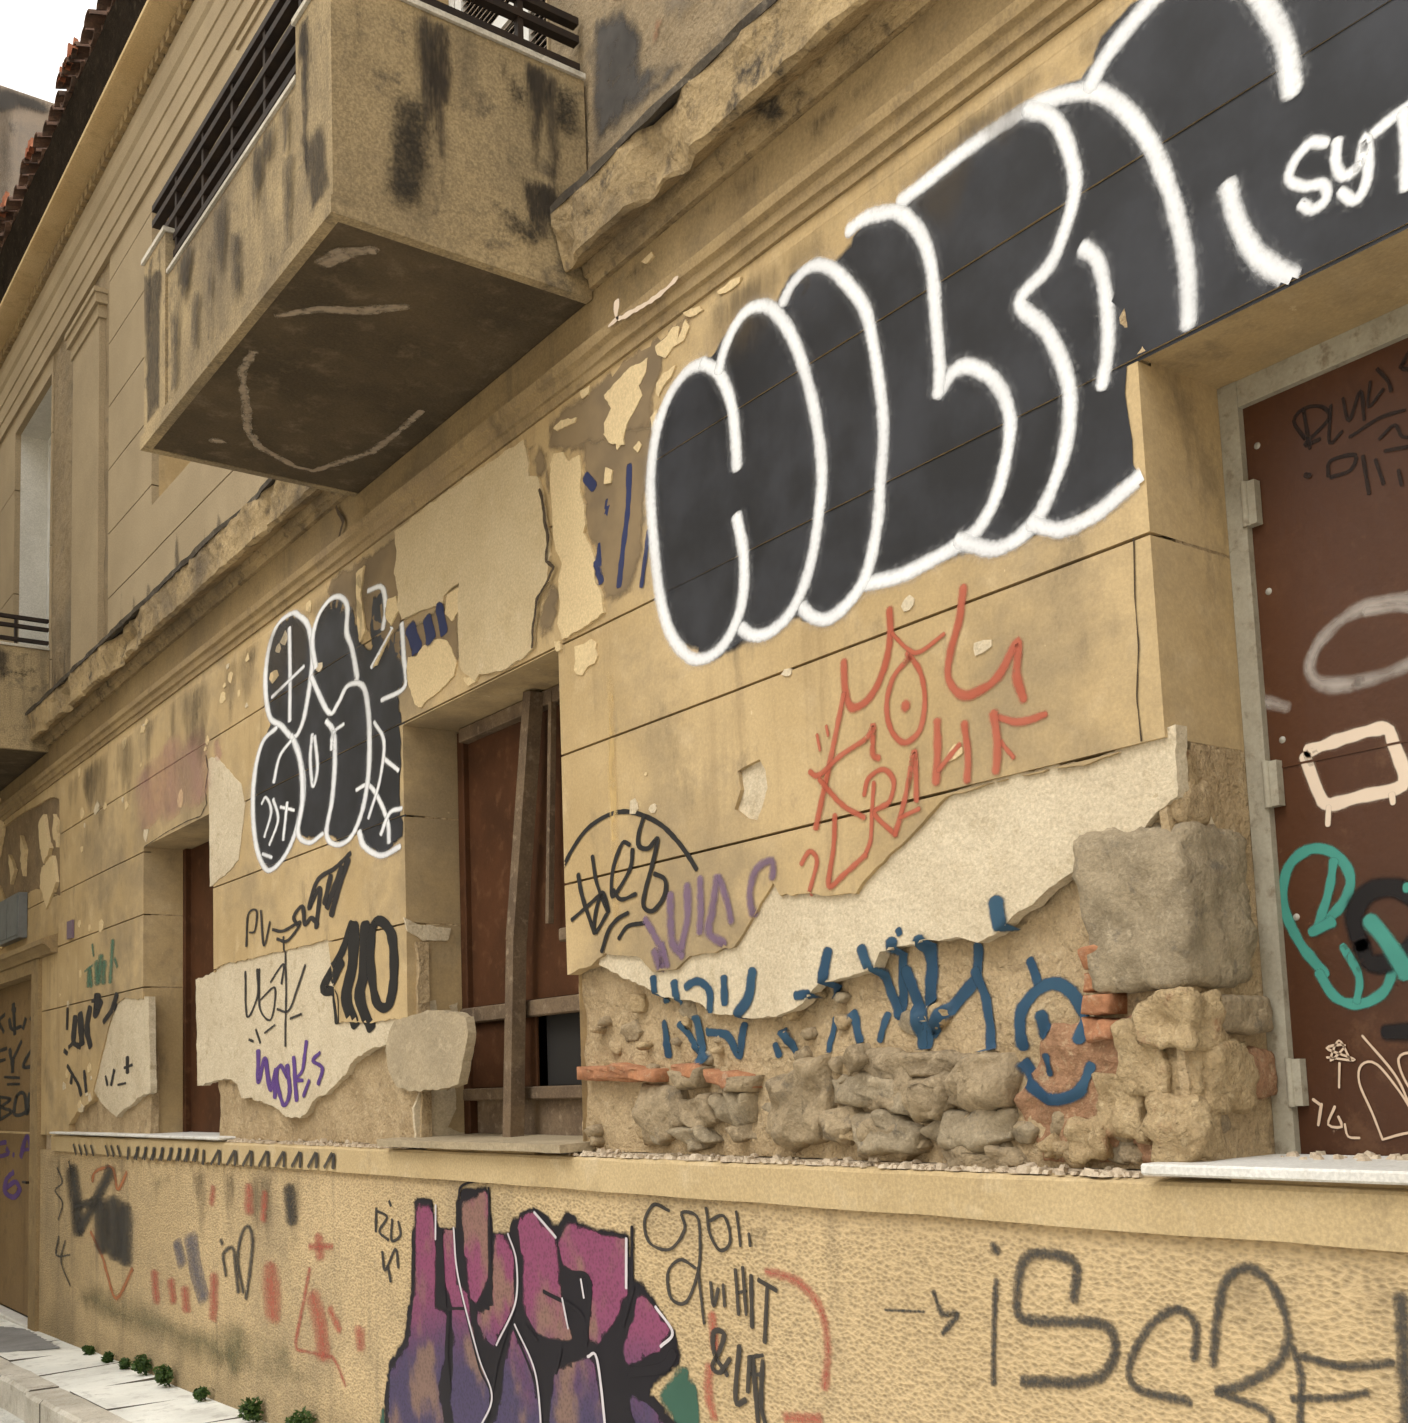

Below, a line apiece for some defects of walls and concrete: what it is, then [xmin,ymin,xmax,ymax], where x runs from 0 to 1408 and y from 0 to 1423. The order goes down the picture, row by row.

water stain [0,89,48,126]
water stain [252,22,326,235]
water stain [389,18,450,202]
water stain [144,197,240,420]
water stain [276,305,407,317]
flaking render [608,276,678,327]
water stain [239,351,425,472]
flaking render [328,306,704,708]
flaking render [0,798,62,909]
flaking render [75,996,159,1134]
flaking render [196,917,476,1144]
flaking render [577,724,1278,1170]